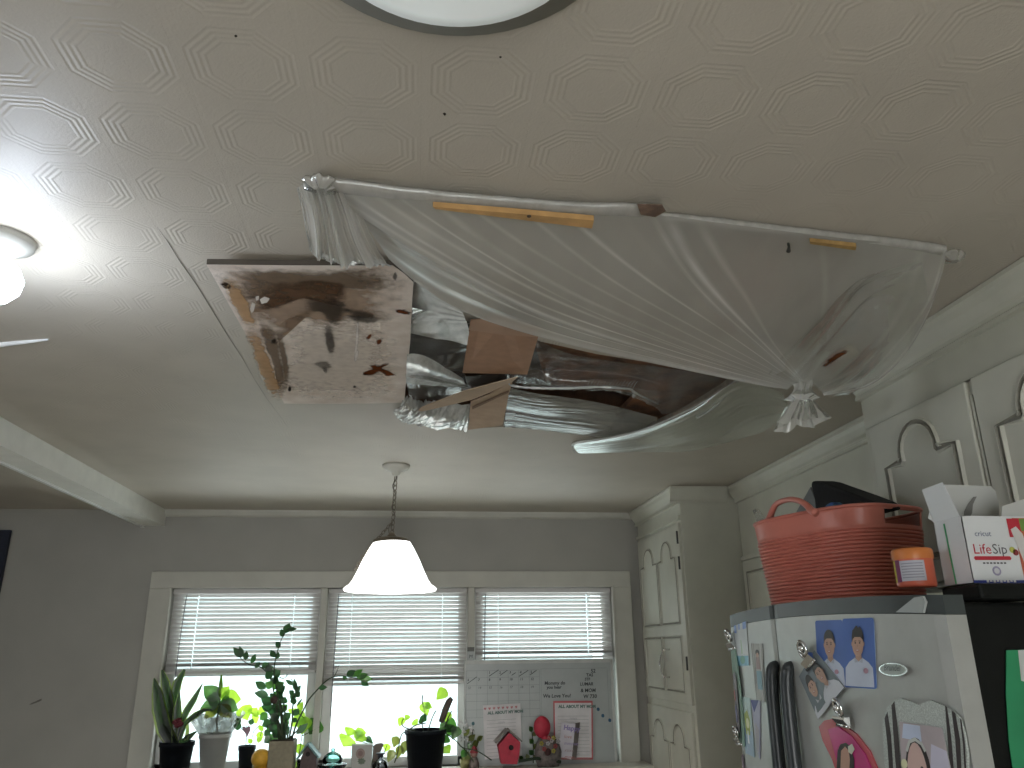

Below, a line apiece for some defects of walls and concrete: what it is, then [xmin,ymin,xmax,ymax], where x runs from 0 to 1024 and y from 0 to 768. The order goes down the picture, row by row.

leakage [227,270,387,394]